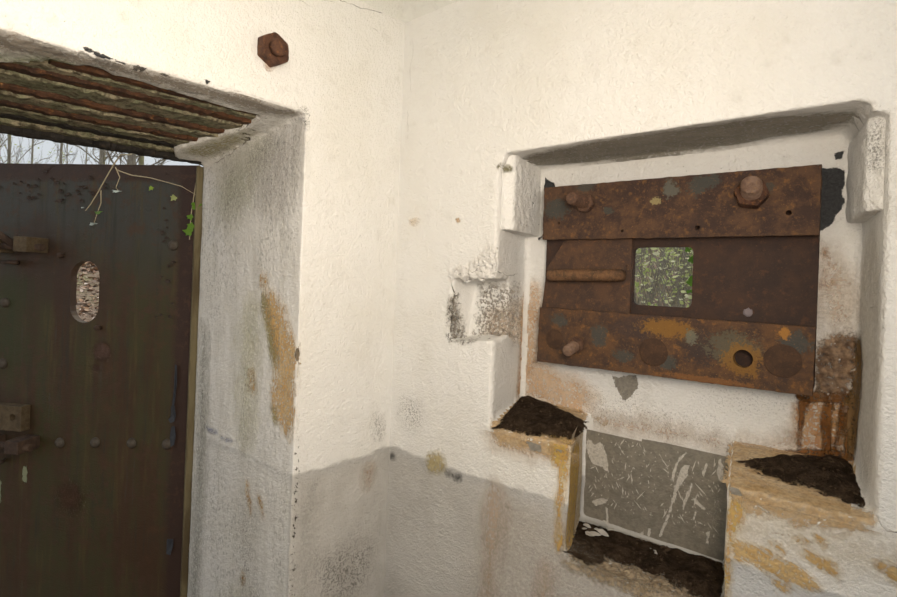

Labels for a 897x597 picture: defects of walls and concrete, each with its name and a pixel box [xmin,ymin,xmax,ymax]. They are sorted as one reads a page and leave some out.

flaking render [447,244,515,336]
corrosion [489,289,703,597]
corrosion [720,339,875,591]